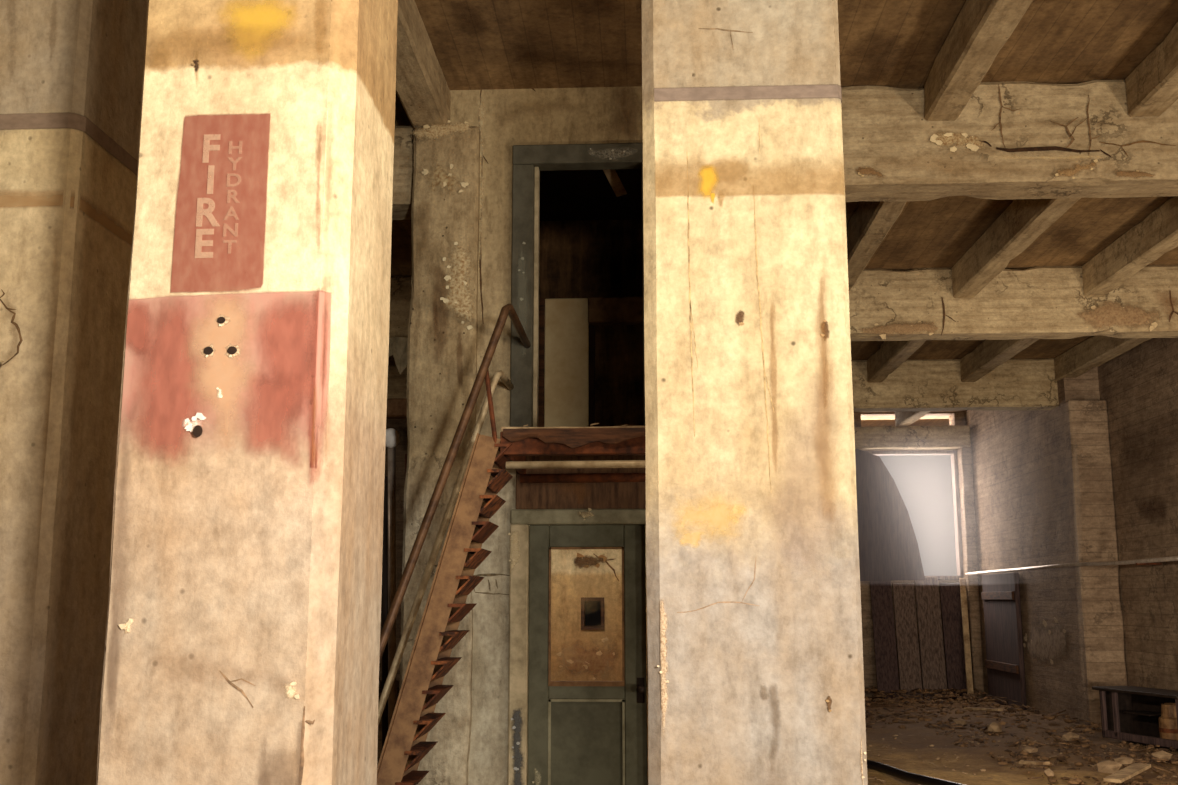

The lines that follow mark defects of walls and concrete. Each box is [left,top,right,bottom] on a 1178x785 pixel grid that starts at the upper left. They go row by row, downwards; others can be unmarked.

spalling [930,132,983,152]
crack [980,84,1176,157]
crack [0,289,23,366]
spalling [1078,301,1159,332]
peeling [121,291,331,468]